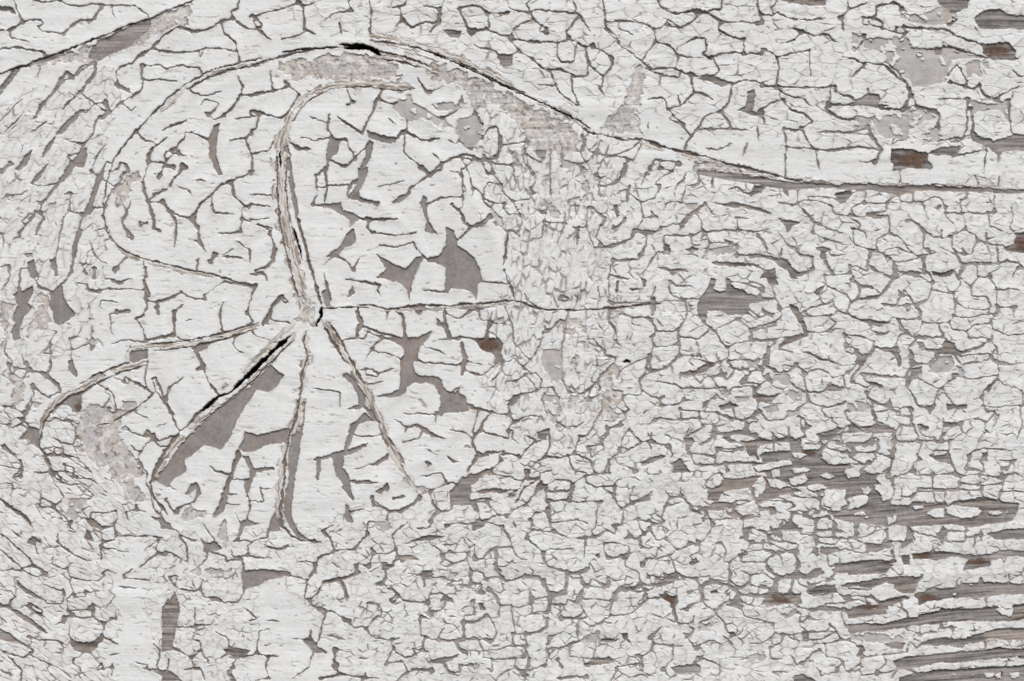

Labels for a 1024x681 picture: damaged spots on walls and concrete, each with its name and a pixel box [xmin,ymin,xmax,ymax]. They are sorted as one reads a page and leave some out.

crack [0,0,194,77]
crack [456,0,615,106]
crack [843,34,948,132]
crack [861,2,992,63]
crack [303,114,380,207]
peeling [0,230,83,349]
peeling [376,192,483,316]
peeling [697,249,800,324]
peeling [355,312,468,417]
peeling [152,366,290,551]
peeling [692,404,1024,681]
crack [0,531,118,681]